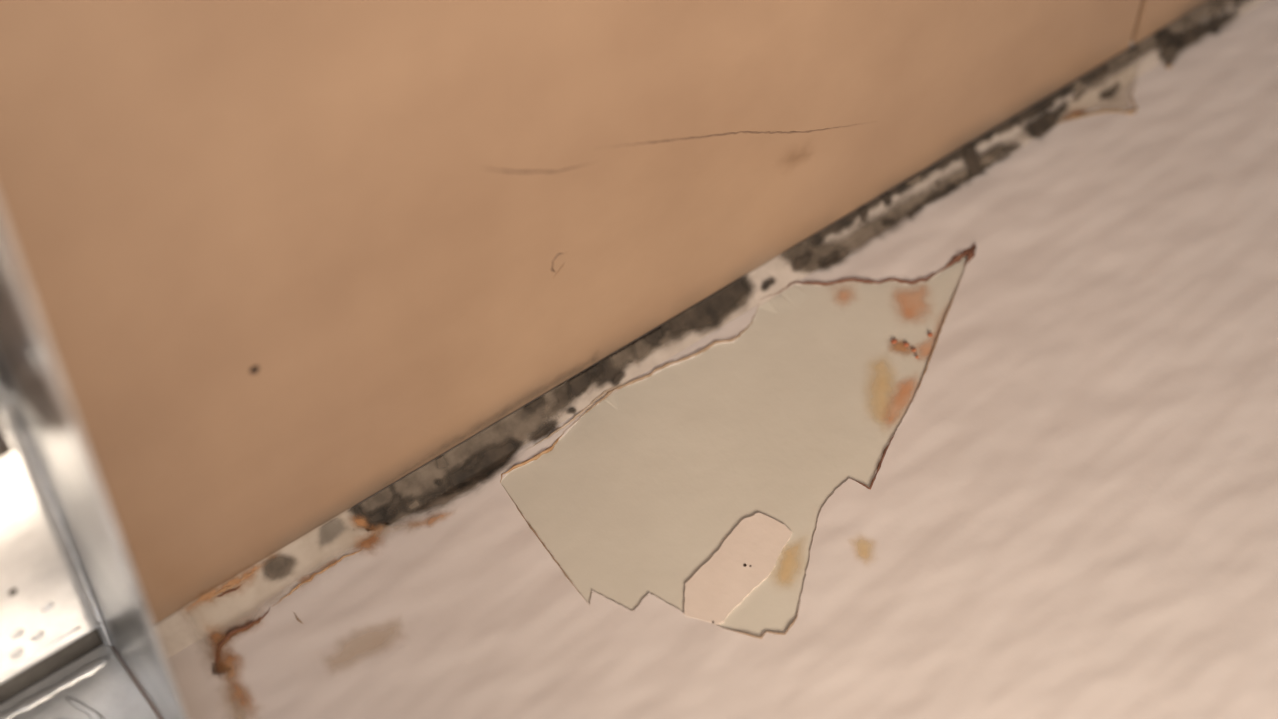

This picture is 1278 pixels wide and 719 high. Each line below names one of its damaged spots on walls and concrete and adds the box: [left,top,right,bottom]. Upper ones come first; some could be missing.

mould [782,0,1246,271]
mould [264,556,295,580]
peeling [185,509,399,676]
mould [322,518,342,543]
damp [352,276,775,529]
peeling [500,244,976,639]